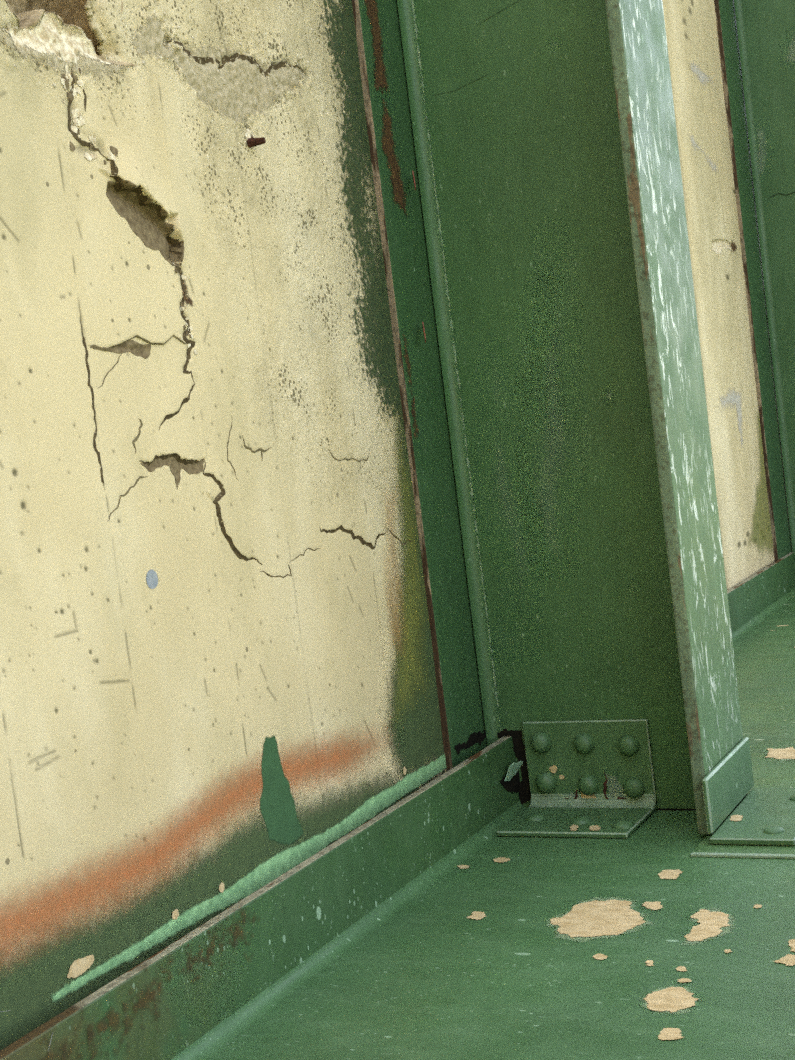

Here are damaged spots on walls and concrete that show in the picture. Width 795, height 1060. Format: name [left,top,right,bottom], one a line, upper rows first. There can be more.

spalling [0,0,303,165]
crack [81,254,198,520]
crack [203,426,412,578]
peeling [504,761,523,781]
peeling [766,747,795,760]
peeling [658,869,682,879]
peeling [466,911,485,920]
peeling [548,898,663,942]
peeling [685,909,734,944]
peeling [775,939,795,966]
peeling [643,966,698,1013]
peeling [658,1028,684,1040]